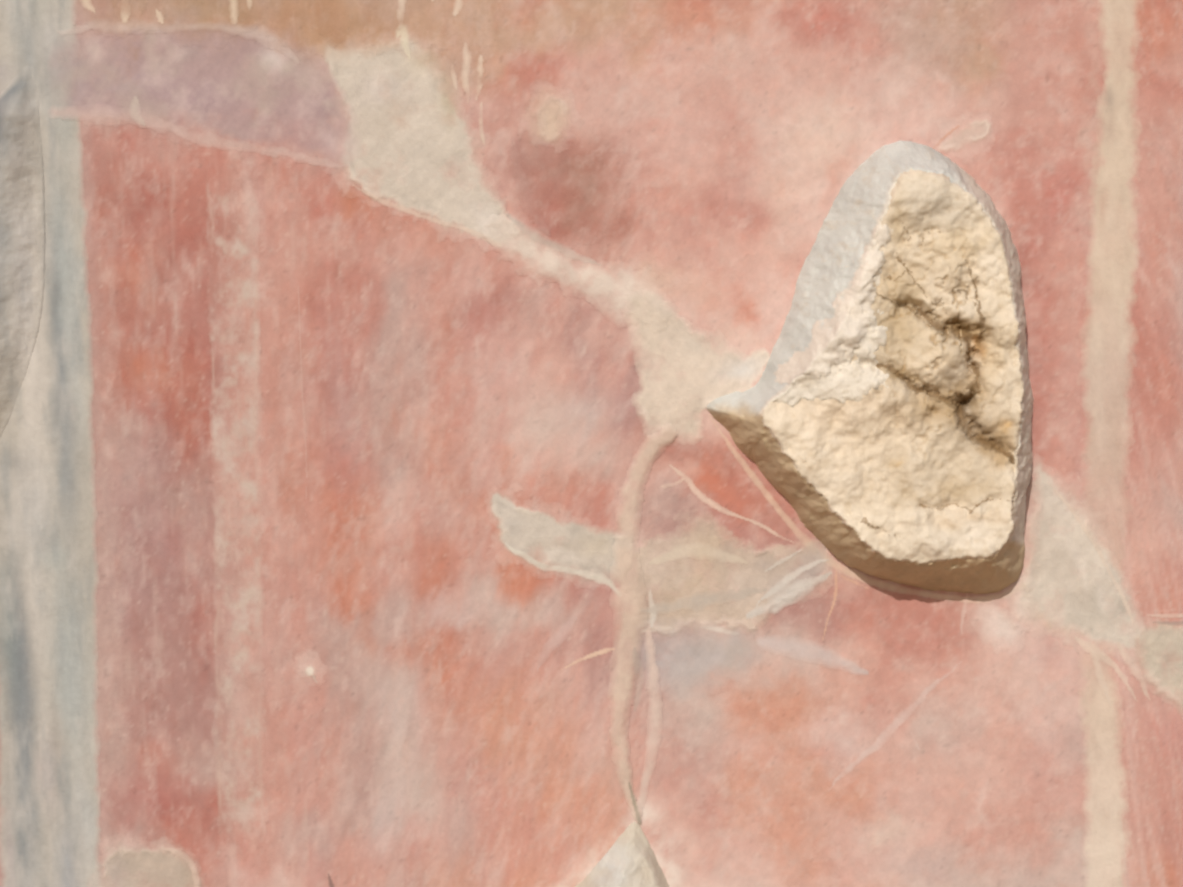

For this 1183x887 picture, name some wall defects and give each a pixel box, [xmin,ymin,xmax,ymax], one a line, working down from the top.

flaking render [323,42,508,253]
peeling [516,78,583,154]
flaking render [484,483,615,592]
crack [561,423,678,826]
flaking render [638,506,834,631]
flaking render [965,451,1183,728]